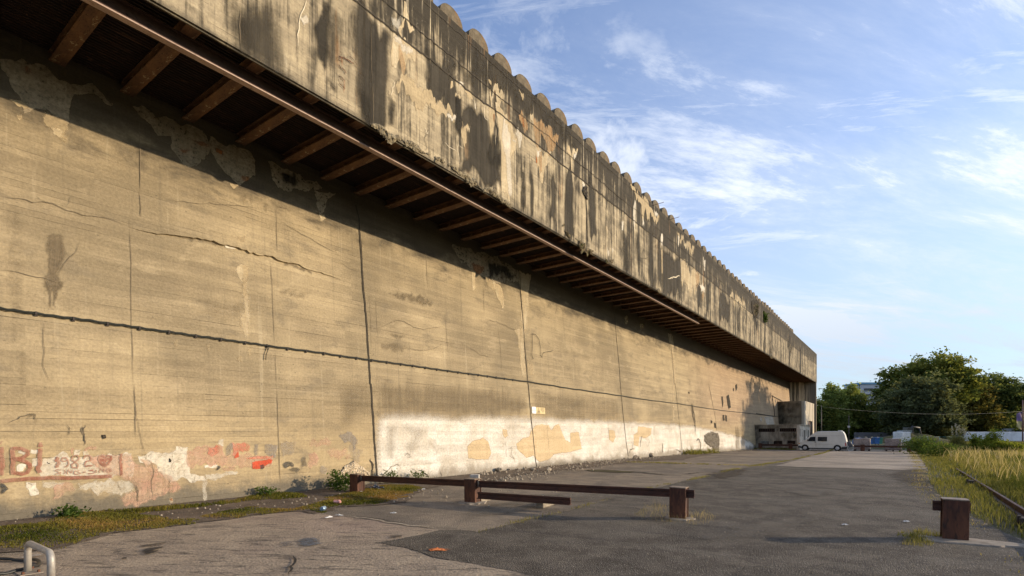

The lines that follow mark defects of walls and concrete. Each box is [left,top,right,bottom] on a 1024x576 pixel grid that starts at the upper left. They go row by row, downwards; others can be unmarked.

damp [315,3,331,67]
peeling [0,58,113,141]
damp [354,0,608,241]
peeling [132,105,336,220]
crack [3,194,125,225]
damp [46,235,65,305]
damp [607,184,758,331]